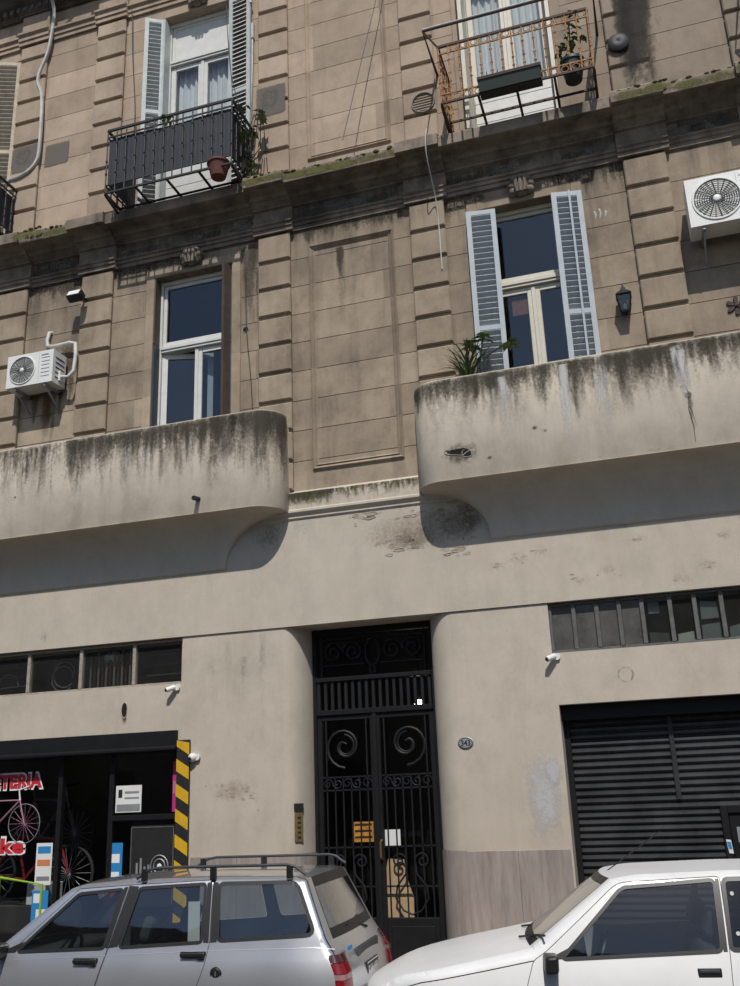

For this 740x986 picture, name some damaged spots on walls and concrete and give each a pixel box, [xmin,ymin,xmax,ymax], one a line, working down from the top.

damp [414,332,740,429]
damp [4,447,46,472]
damp [66,410,287,472]
peeling [374,500,482,557]